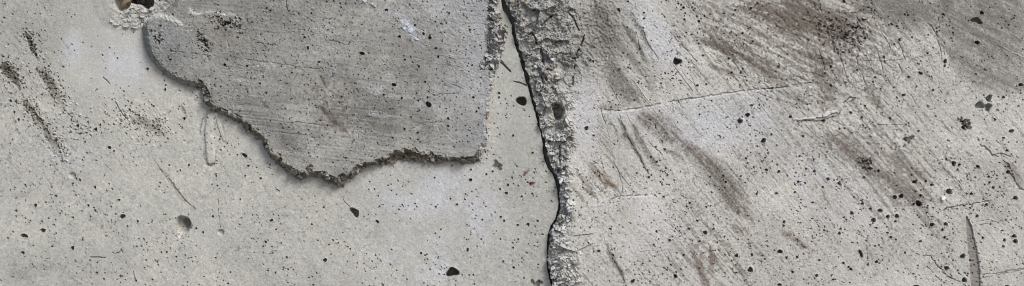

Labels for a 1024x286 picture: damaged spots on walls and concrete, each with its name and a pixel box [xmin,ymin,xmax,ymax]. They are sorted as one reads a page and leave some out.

peeling [109,0,596,286]
crack [499,0,594,285]